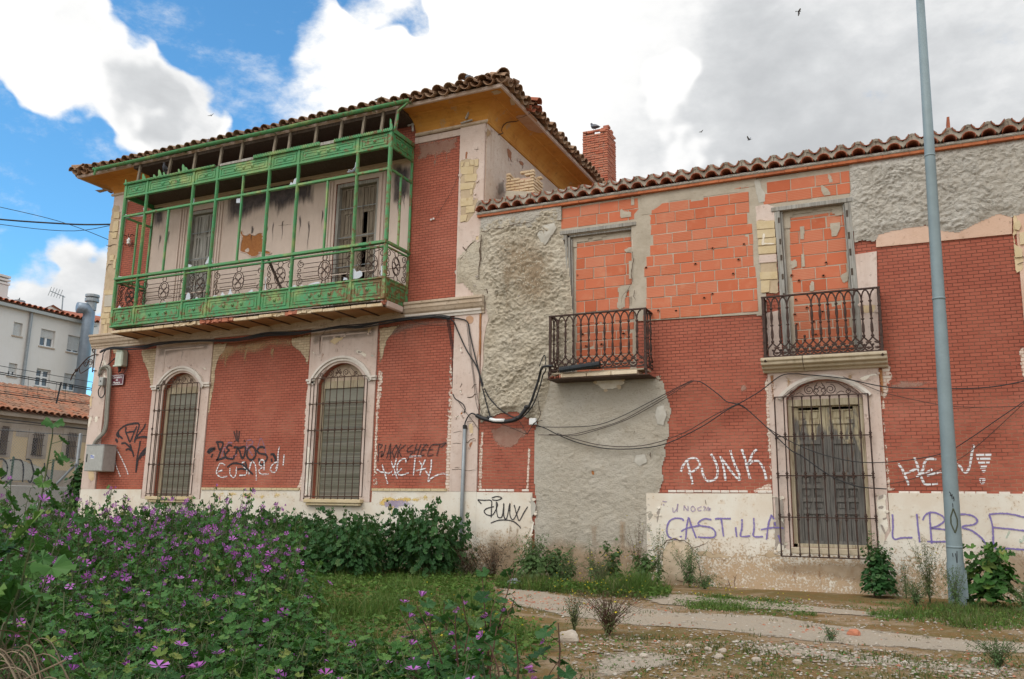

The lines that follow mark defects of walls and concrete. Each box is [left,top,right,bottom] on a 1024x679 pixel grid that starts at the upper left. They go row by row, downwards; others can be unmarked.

damp [230,180,311,216]
peeling [445,336,537,537]